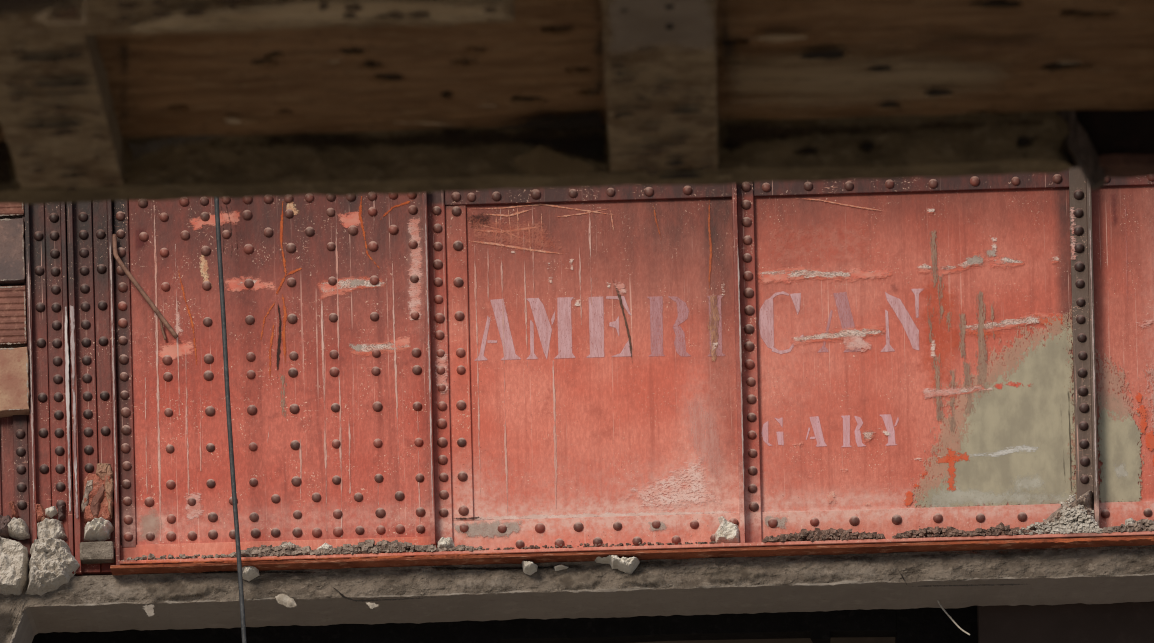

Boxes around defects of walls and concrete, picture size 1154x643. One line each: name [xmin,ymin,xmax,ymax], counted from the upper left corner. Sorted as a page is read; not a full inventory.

spalling [65,247,117,524]
rust [260,203,302,375]
peeling [321,279,365,291]
peeling [902,229,1077,508]
peeling [1092,309,1154,503]